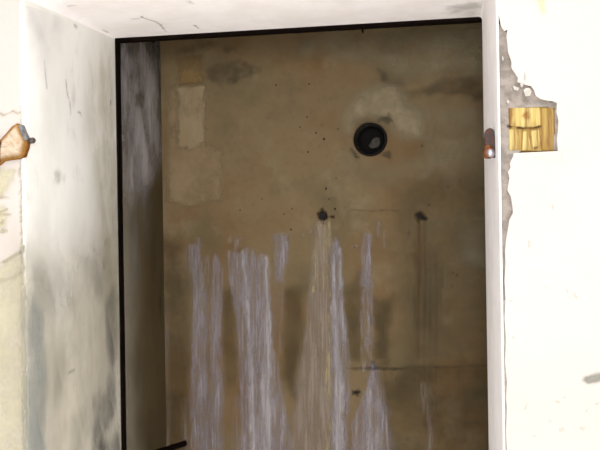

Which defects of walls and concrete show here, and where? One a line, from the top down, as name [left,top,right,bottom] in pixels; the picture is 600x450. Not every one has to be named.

damp [184,245,222,450]
damp [230,221,389,450]
spalling [499,24,558,450]